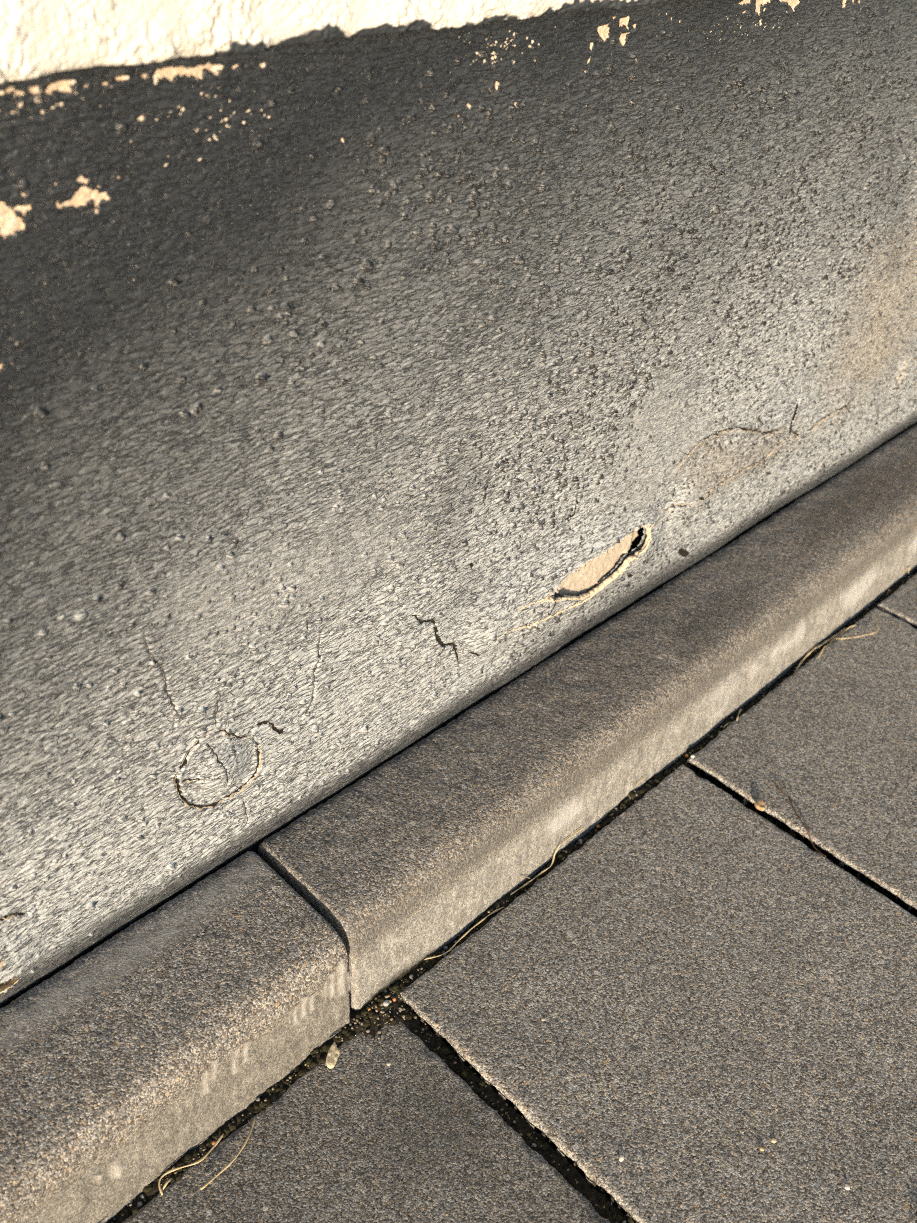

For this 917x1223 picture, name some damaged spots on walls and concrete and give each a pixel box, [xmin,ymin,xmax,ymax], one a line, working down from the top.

peeling [584,16,636,73]
peeling [707,0,800,41]
peeling [0,62,271,141]
peeling [0,193,36,239]
peeling [56,175,110,215]
spalling [491,523,655,641]
crack [412,615,480,664]
crack [145,636,180,721]
crack [175,622,321,824]